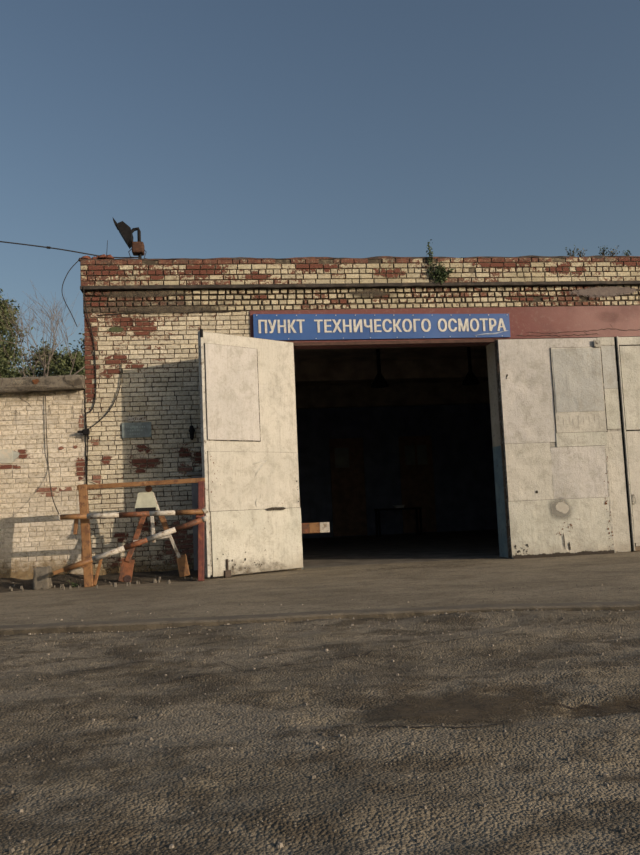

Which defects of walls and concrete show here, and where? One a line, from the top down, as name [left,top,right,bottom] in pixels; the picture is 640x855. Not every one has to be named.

peeling [78,254,230,280]
peeling [241,271,272,284]
peeling [292,259,342,273]
peeling [373,269,406,278]
peeling [472,258,530,272]
peeling [504,262,590,306]
peeling [613,257,640,266]
peeling [112,313,157,339]
peeling [65,291,144,445]
peeling [37,445,113,497]
peeling [127,445,160,473]